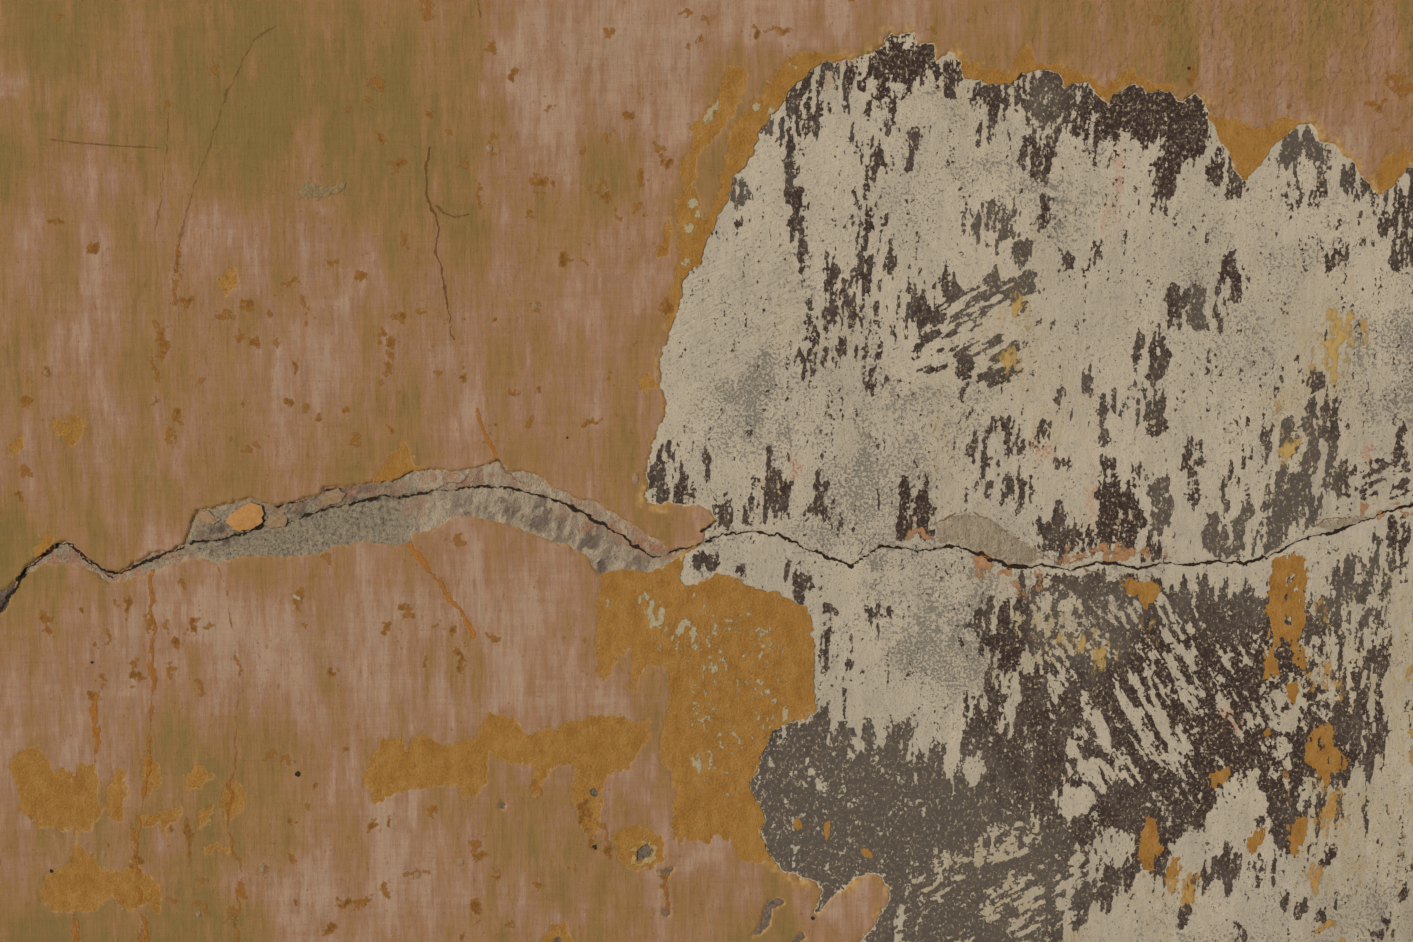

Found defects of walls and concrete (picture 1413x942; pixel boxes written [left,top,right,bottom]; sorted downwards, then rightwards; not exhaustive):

crack [0,458,1413,612]
peeling [638,32,1413,942]
peeling [25,441,816,865]
peeling [9,745,246,914]
peeling [542,923,573,942]
peeling [613,825,673,878]